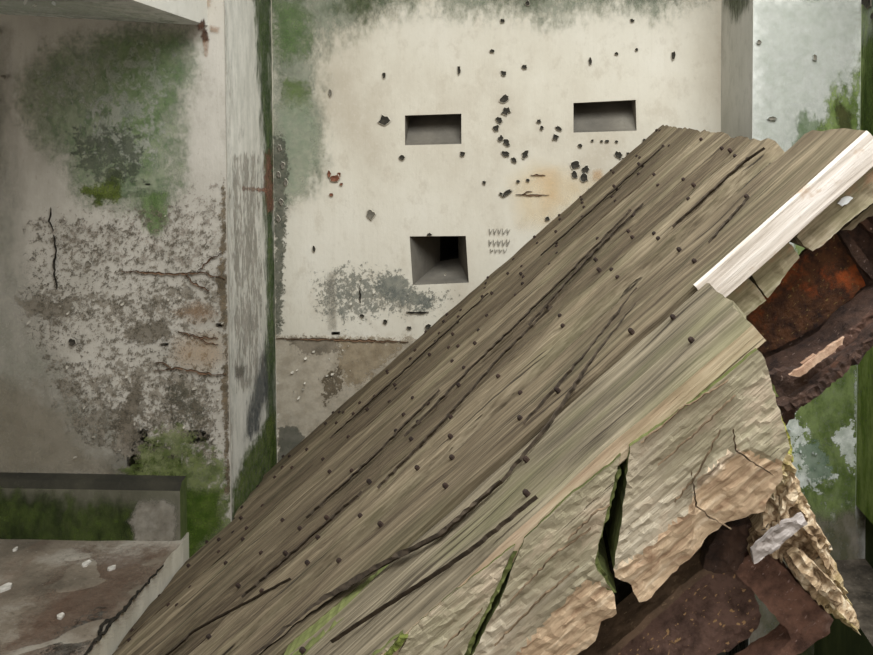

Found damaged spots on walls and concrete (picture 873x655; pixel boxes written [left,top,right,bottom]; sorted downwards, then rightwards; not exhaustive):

corrosion [197,20,213,50]
leakage [861,0,873,136]
crack [48,207,58,289]
leakage [141,193,167,234]
corrosion [243,151,274,214]
leakage [0,217,141,474]
peeling [14,179,230,495]
leakage [815,510,866,560]
crack [84,564,164,655]
leakage [726,593,780,655]